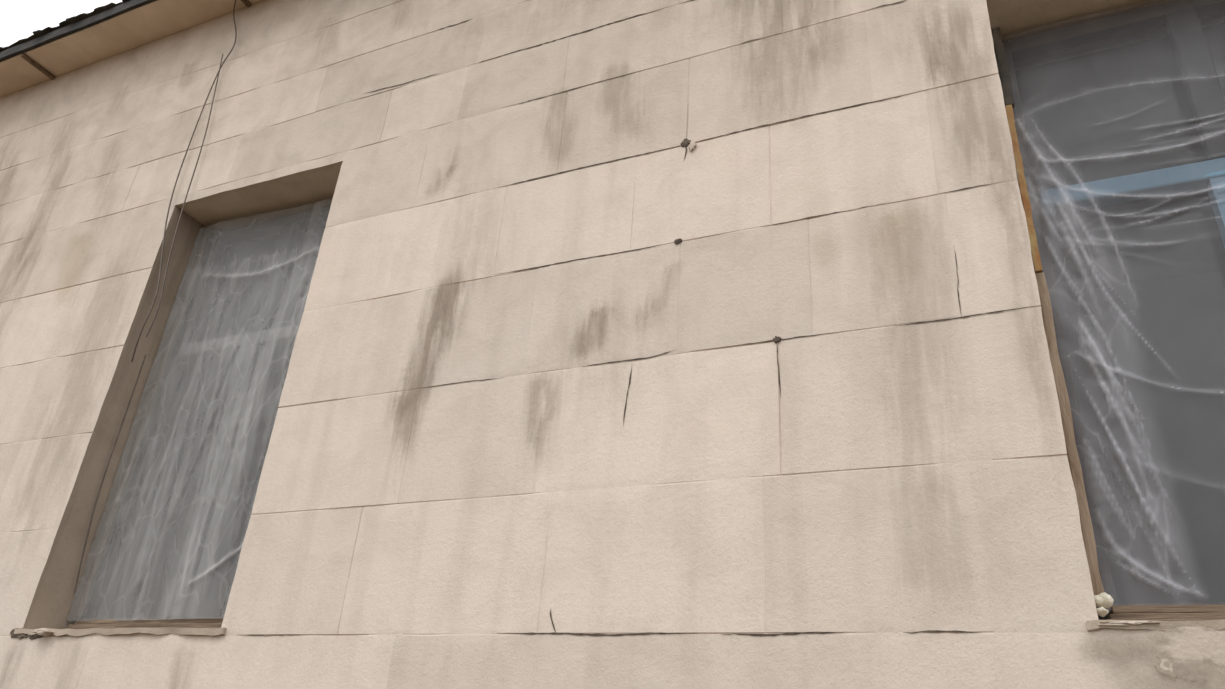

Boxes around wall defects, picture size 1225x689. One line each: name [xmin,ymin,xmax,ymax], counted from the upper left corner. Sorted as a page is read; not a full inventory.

crack [582,350,674,426]
spalling [1095,621,1225,689]